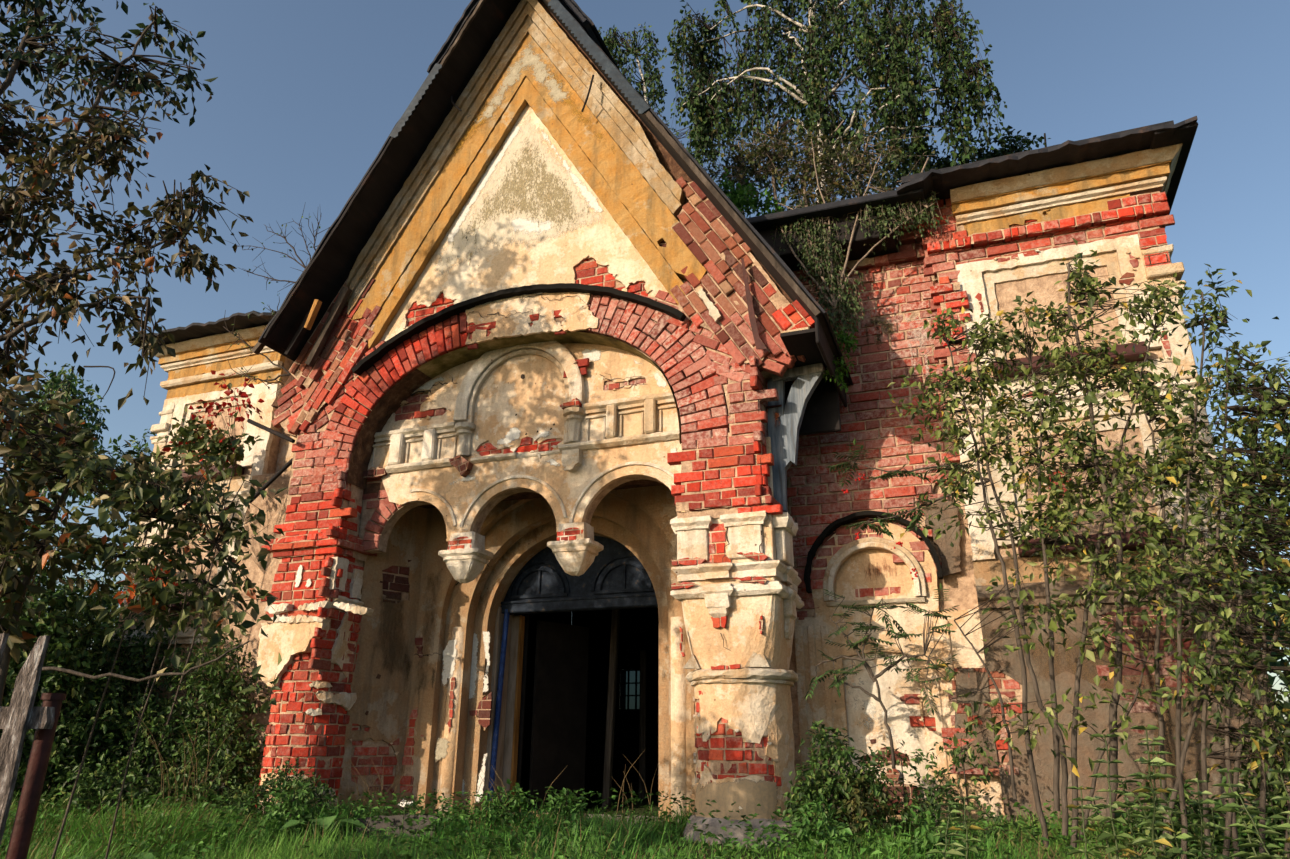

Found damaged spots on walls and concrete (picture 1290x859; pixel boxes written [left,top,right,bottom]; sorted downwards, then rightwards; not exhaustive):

leakage [436,117,602,272]
flaking render [574,255,653,296]
flaking render [403,289,457,329]
flaking render [560,398,582,410]
flaking render [449,423,563,478]
flaking render [447,677,492,733]
flaking render [693,691,782,786]
flaking render [900,666,1022,776]